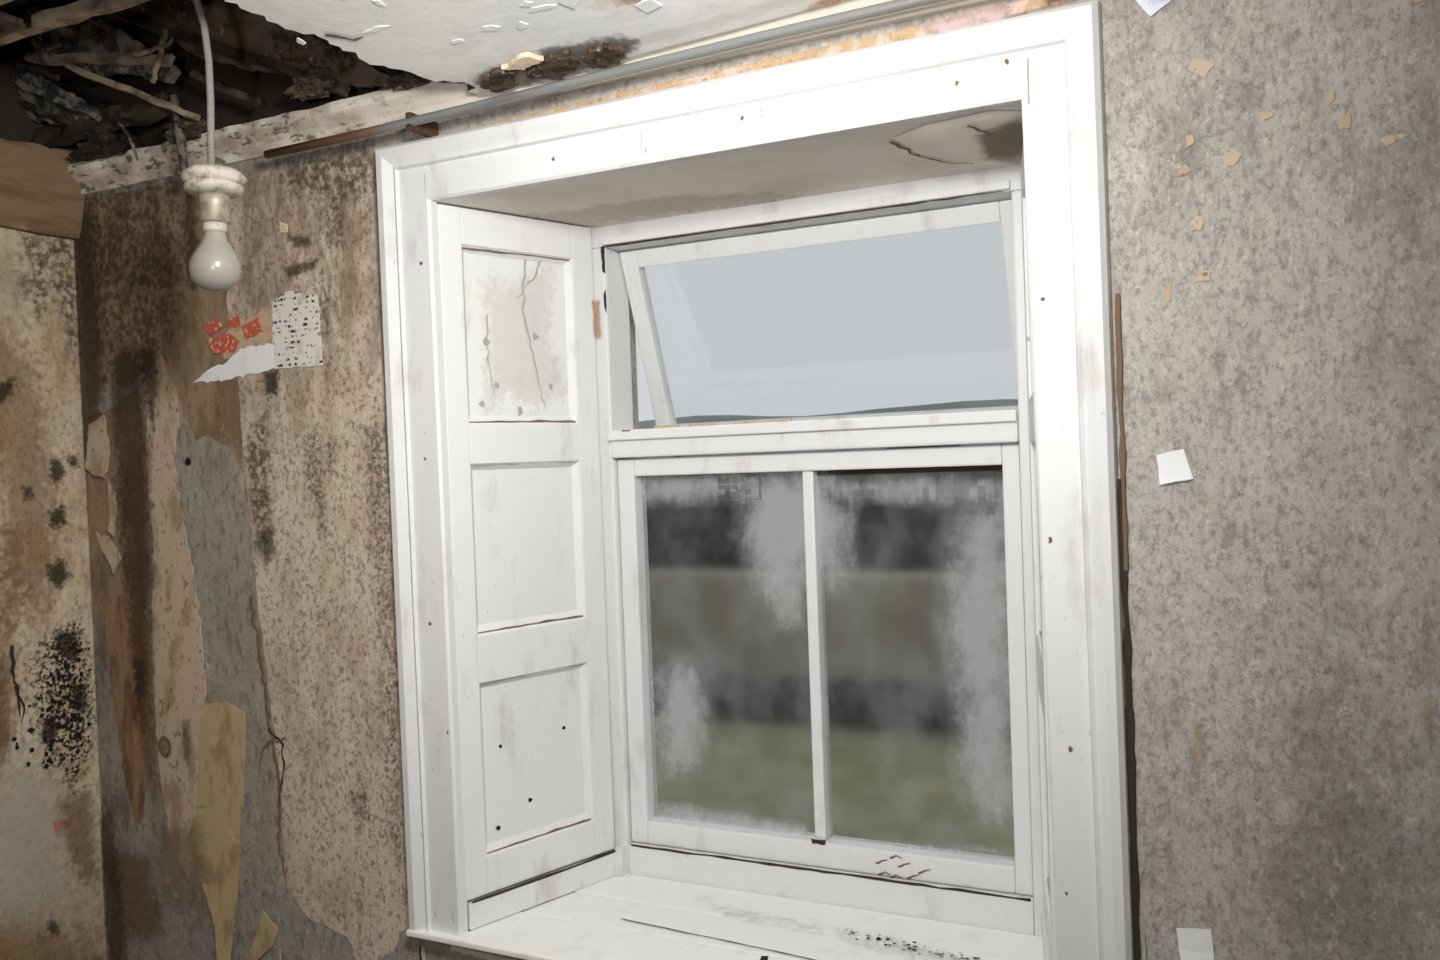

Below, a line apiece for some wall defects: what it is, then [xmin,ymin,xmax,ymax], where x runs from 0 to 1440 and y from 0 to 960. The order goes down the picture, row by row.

leakage [289,150,365,247]
peeling [84,414,121,574]
leakage [21,181,198,758]
leakage [0,623,92,934]
peeling [185,701,246,960]